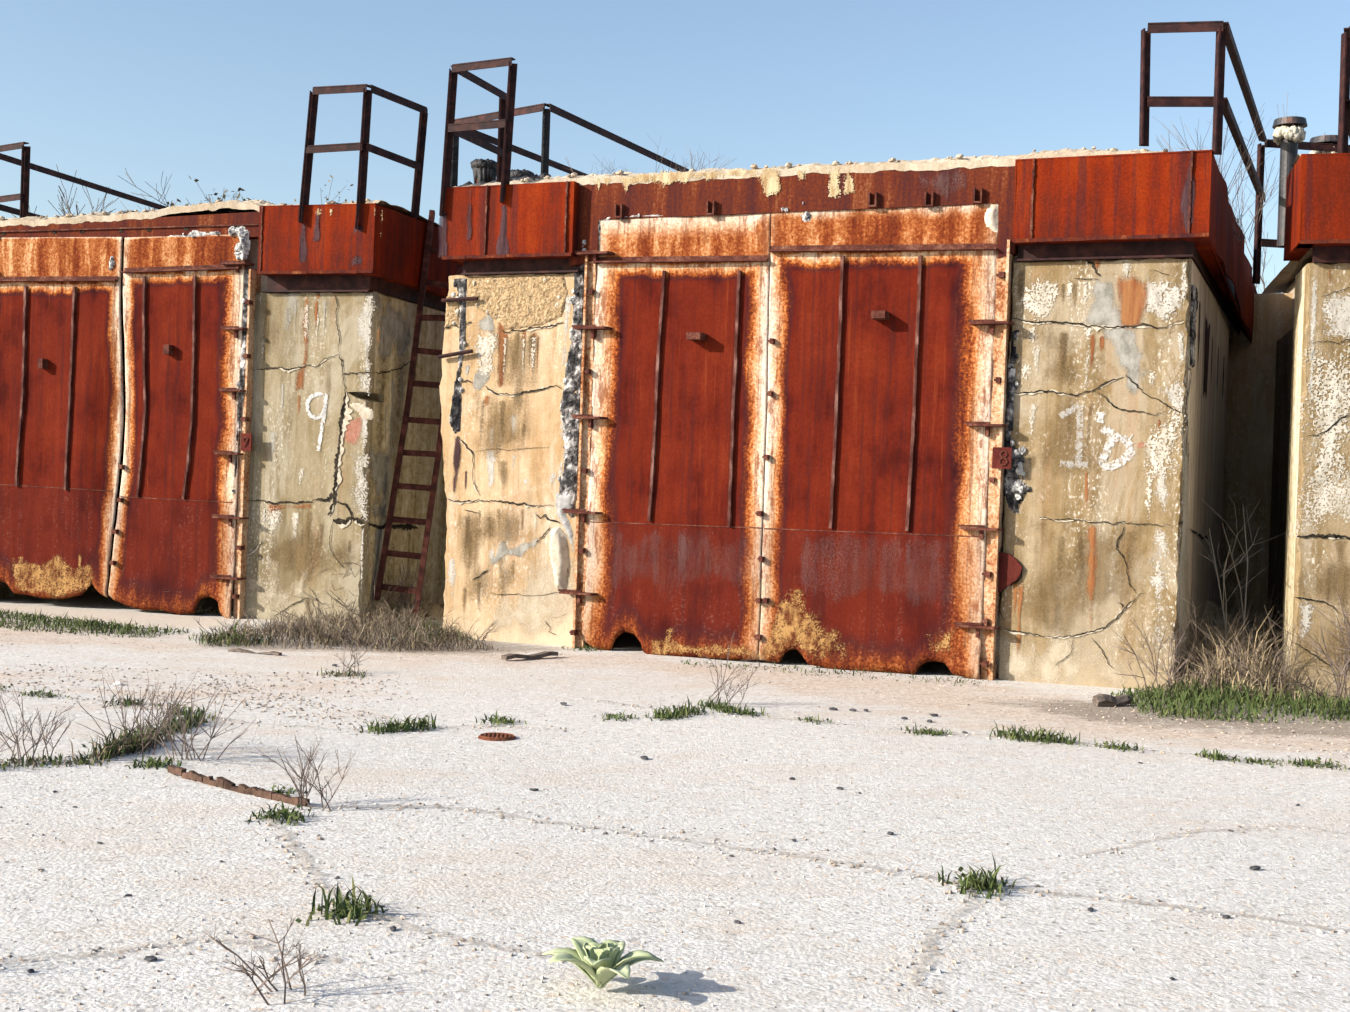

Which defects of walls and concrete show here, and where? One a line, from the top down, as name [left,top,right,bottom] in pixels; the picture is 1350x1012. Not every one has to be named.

rust [496,206,509,255]
rust [1181,163,1195,232]
crack [1009,269,1193,331]
rust [1118,277,1147,326]
spalling [1004,276,1089,513]
crack [1014,356,1192,477]
crack [248,295,418,617]
damp [453,437,467,492]
crack [443,436,560,542]
rust [12,554,93,598]
rust [651,589,846,660]
crack [998,517,1208,669]